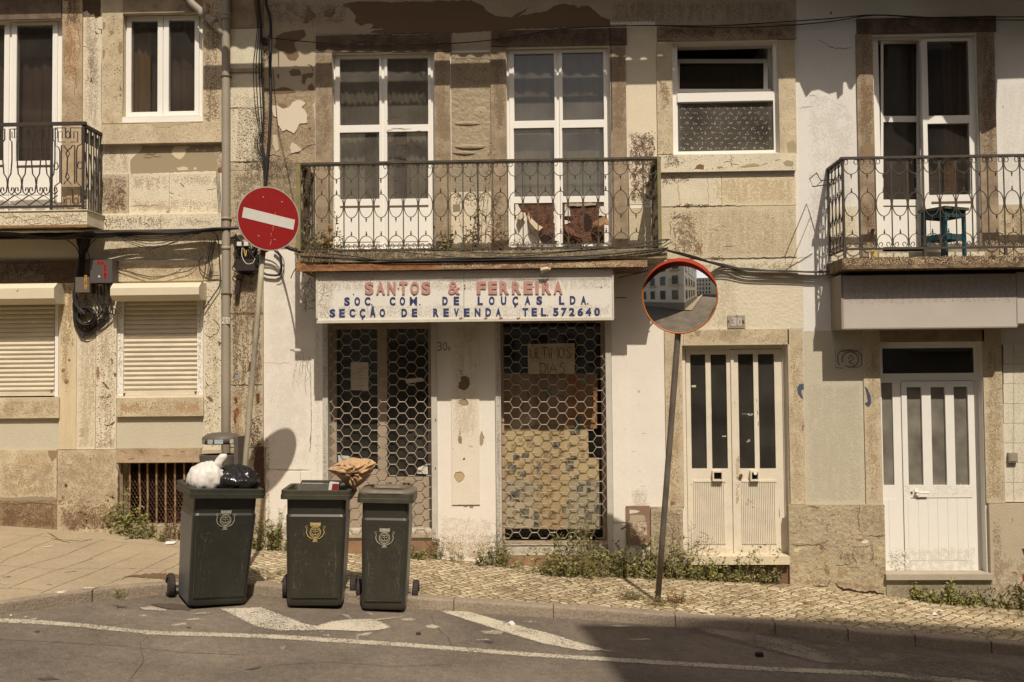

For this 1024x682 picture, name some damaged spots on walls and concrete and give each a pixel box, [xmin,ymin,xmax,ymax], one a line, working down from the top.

flaking render [266,0,611,154]
spalling [458,373,475,405]
crack [793,505,885,595]